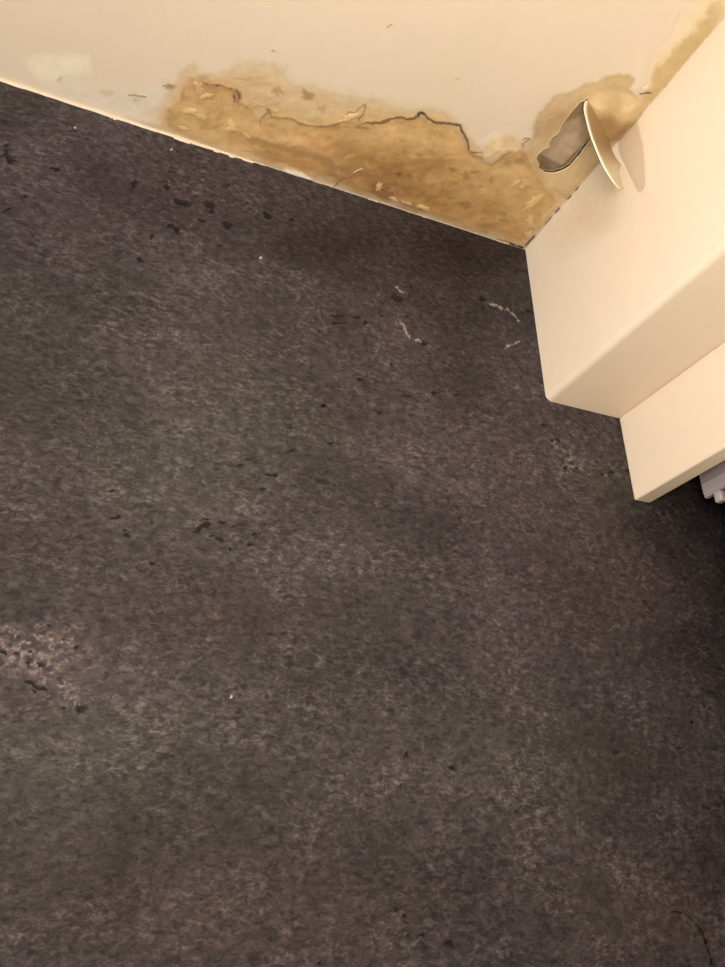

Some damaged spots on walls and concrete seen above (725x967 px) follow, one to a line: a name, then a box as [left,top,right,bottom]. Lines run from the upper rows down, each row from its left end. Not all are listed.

peeling [281,167,338,189]
damp [34,0,725,266]
spalling [536,98,624,190]